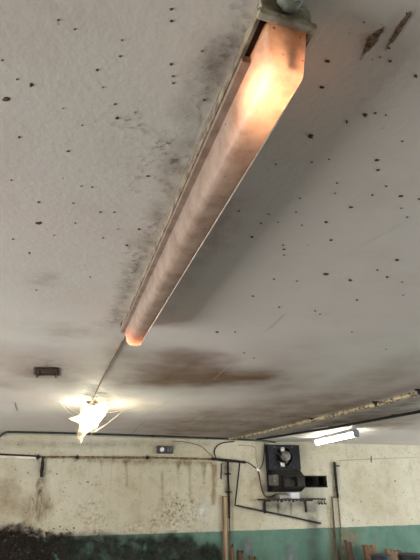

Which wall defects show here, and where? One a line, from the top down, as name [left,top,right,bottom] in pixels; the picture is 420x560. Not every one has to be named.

spalling [362,26,384,56]
spalling [387,11,412,47]
damp [148,361,266,384]